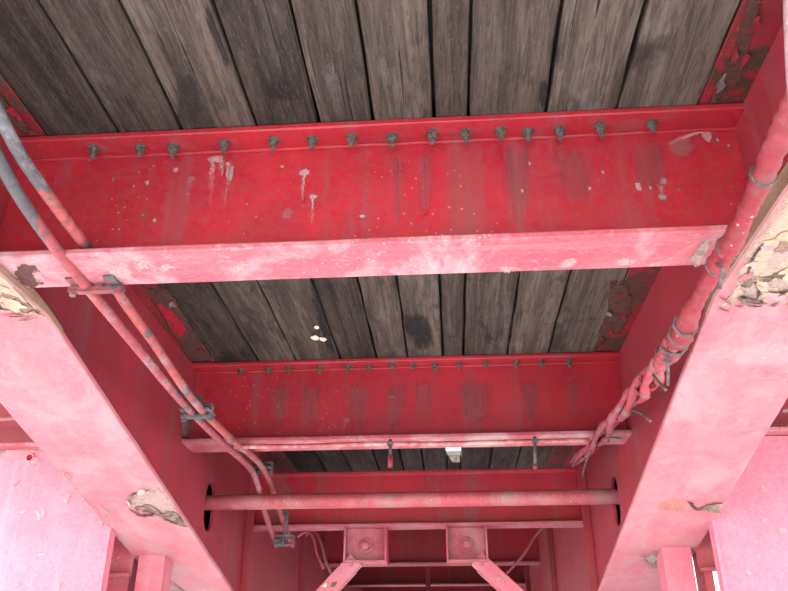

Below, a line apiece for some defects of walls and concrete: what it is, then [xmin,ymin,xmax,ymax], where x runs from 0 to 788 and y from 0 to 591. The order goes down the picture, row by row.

peeling [731,44,751,70]
peeling [716,73,726,93]
water stain [211,158,234,185]
peeling [718,191,788,313]
peeling [0,276,43,322]